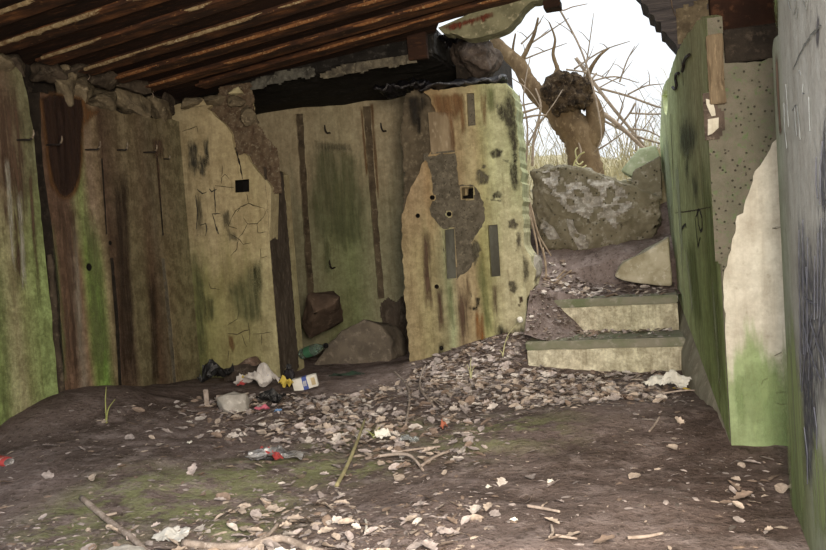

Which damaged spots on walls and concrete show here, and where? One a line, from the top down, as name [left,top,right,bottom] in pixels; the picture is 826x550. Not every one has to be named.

leakage [0,90,38,277]
leakage [43,95,83,196]
crack [215,147,267,258]
spalling [210,55,417,376]
spalling [400,88,489,280]
peeling [491,98,518,188]
spalling [703,81,776,267]